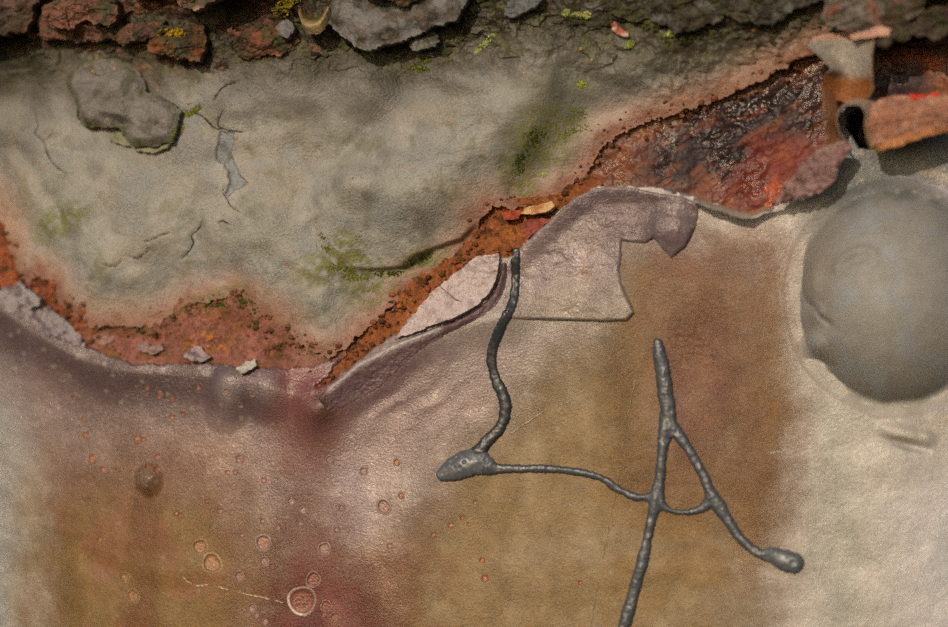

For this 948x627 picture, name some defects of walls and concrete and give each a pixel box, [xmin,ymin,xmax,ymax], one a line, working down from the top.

crack [34,114,67,174]
crack [197,81,241,133]
corrosion [0,51,842,387]
peeling [0,0,948,410]